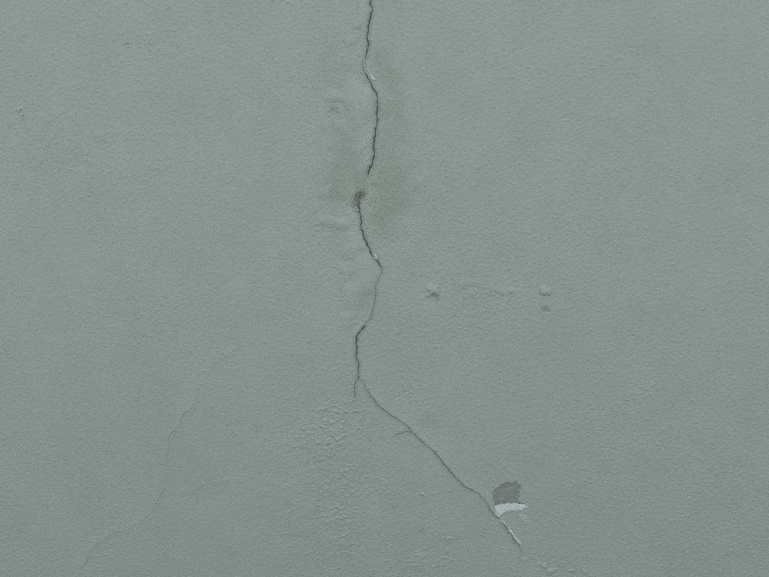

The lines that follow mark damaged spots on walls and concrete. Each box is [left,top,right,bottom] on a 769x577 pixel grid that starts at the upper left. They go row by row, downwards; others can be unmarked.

crack [349,0,548,577]
spalling [489,479,531,525]